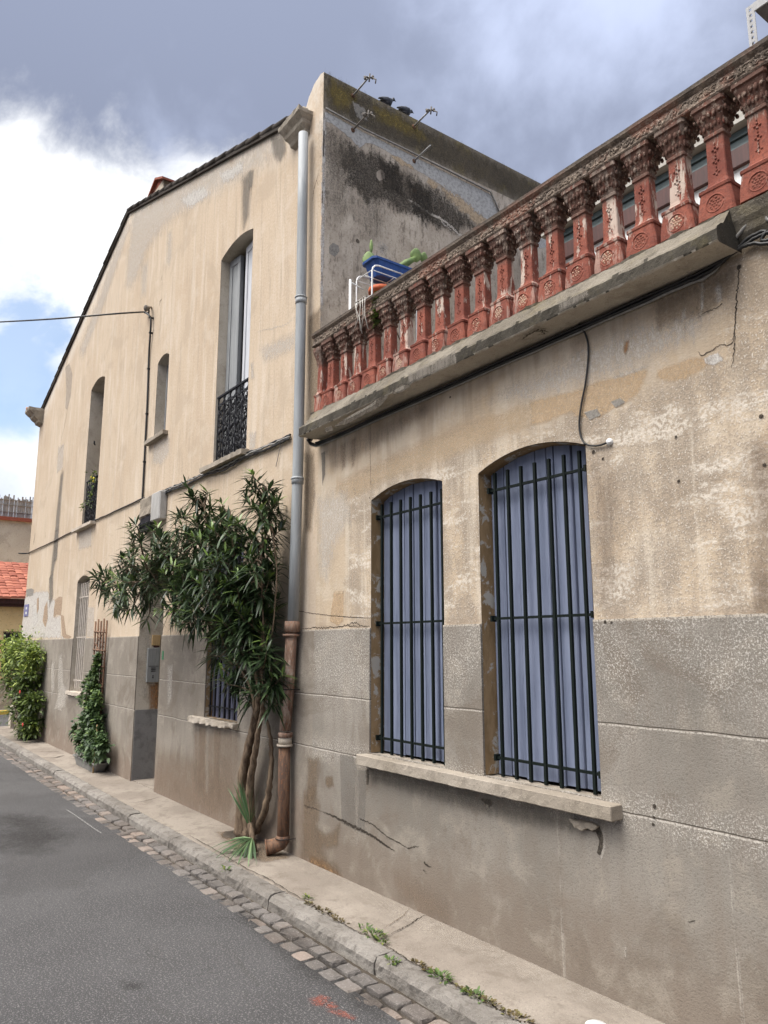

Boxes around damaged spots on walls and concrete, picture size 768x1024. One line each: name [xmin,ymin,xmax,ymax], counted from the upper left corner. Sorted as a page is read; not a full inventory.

damp [339,142,475,235]
peeling [426,178,487,225]
crack [699,264,740,368]
peeling [531,354,722,423]
peeling [22,591,71,639]
crack [310,807,431,874]
spalling [569,819,604,858]